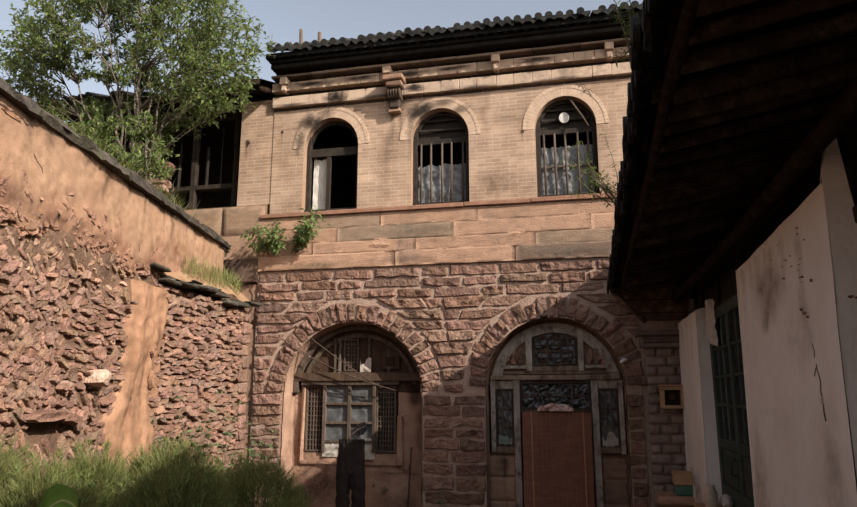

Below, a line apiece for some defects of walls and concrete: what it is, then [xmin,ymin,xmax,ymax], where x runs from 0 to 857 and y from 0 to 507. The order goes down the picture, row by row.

crack [0,103,34,129]
peeling [0,210,59,236]
crack [811,343,826,421]